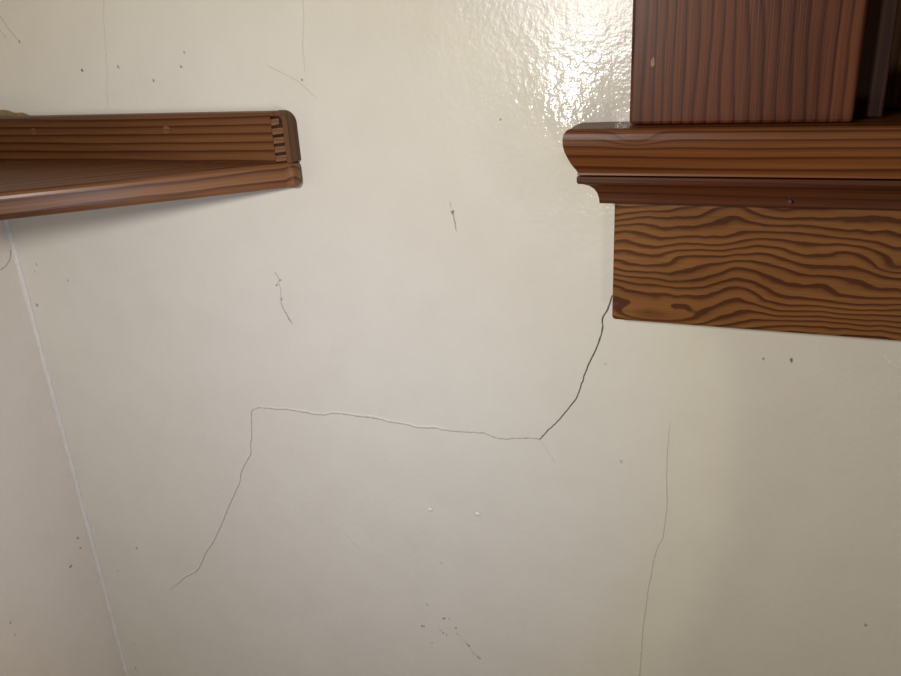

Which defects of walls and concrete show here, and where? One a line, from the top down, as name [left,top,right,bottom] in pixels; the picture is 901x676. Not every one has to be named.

crack [274,272,292,323]
crack [171,295,613,589]